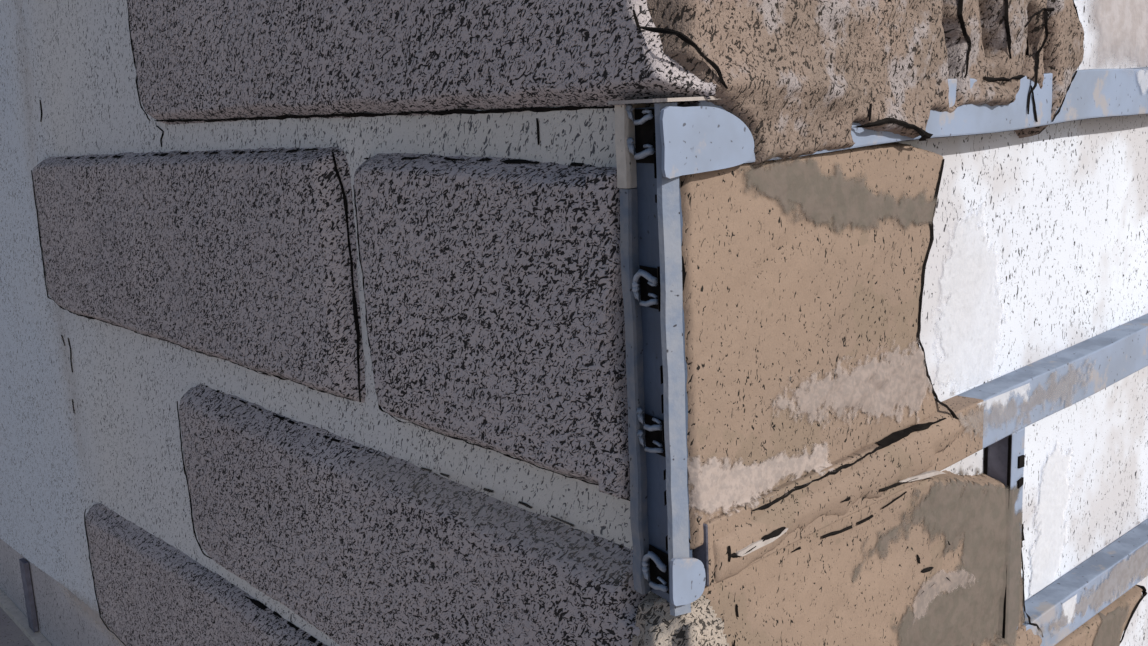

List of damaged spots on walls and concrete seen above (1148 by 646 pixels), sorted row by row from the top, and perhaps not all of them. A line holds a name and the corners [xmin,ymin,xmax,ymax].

crack [944,0,1082,122]
crack [728,103,959,562]
peeling [899,470,945,482]
peeling [736,528,788,557]